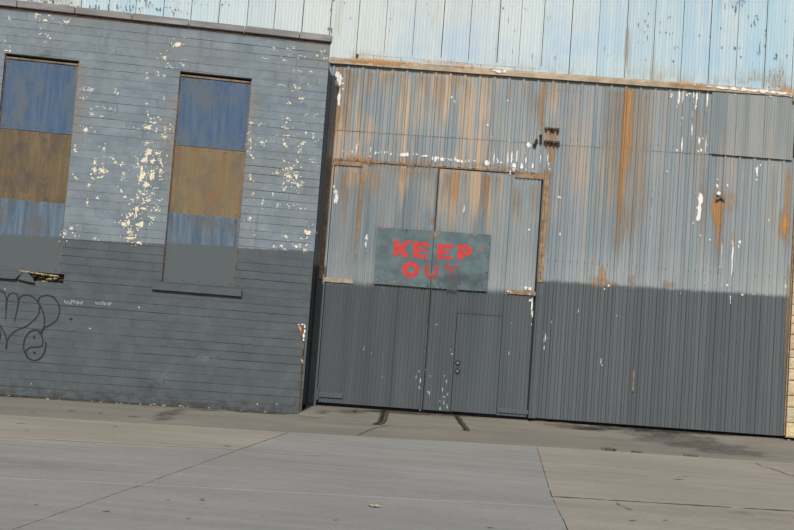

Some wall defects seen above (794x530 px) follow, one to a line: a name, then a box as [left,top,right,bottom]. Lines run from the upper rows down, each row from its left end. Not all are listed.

corrosion [349,58,412,66]
corrosion [539,83,554,163]
peeling [86,141,168,245]
peeling [261,132,319,209]
peeling [370,136,550,174]
corrosion [618,90,647,228]
peeling [693,192,703,224]
corrosion [712,193,734,246]
corrosion [779,176,789,238]
spalling [18,270,64,283]